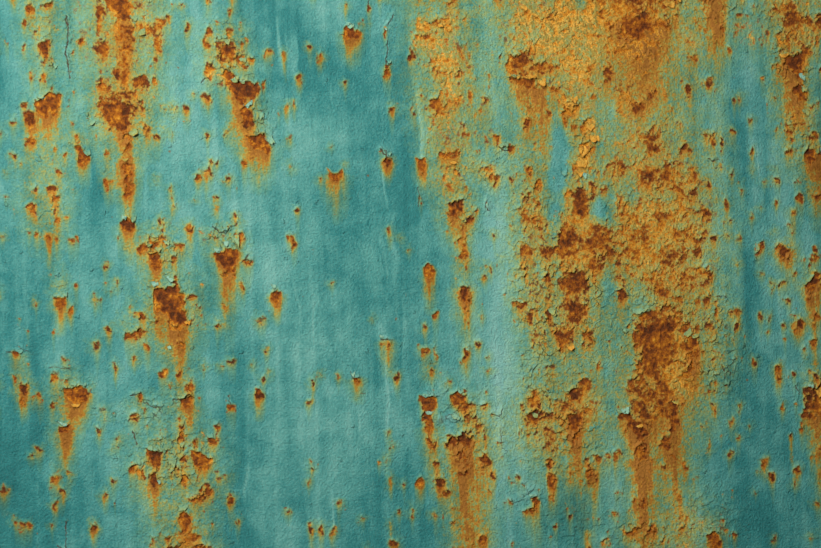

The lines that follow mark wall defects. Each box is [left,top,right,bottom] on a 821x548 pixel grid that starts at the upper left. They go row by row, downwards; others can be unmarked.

crack [60,8,76,88]
spalling [188,59,285,196]
spalling [489,50,606,181]
corrosion [310,139,359,226]
corrosion [0,0,331,548]
corrosion [302,368,346,422]
corrosion [305,497,371,548]